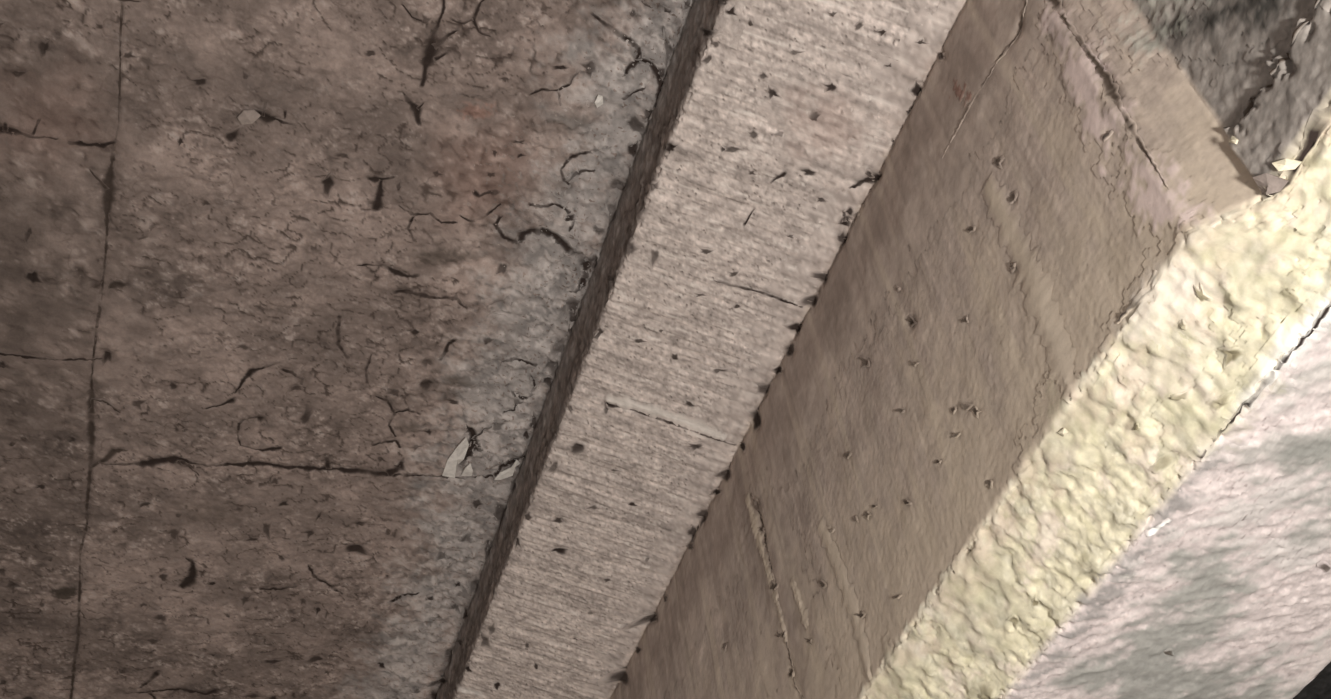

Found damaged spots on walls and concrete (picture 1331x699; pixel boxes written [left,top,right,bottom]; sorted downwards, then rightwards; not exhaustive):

crack [529,71,579,106]
crack [589,11,664,102]
crack [941,0,1170,190]
crack [356,145,611,362]
crack [0,0,539,699]
peeling [442,437,473,478]
crack [750,493,779,606]